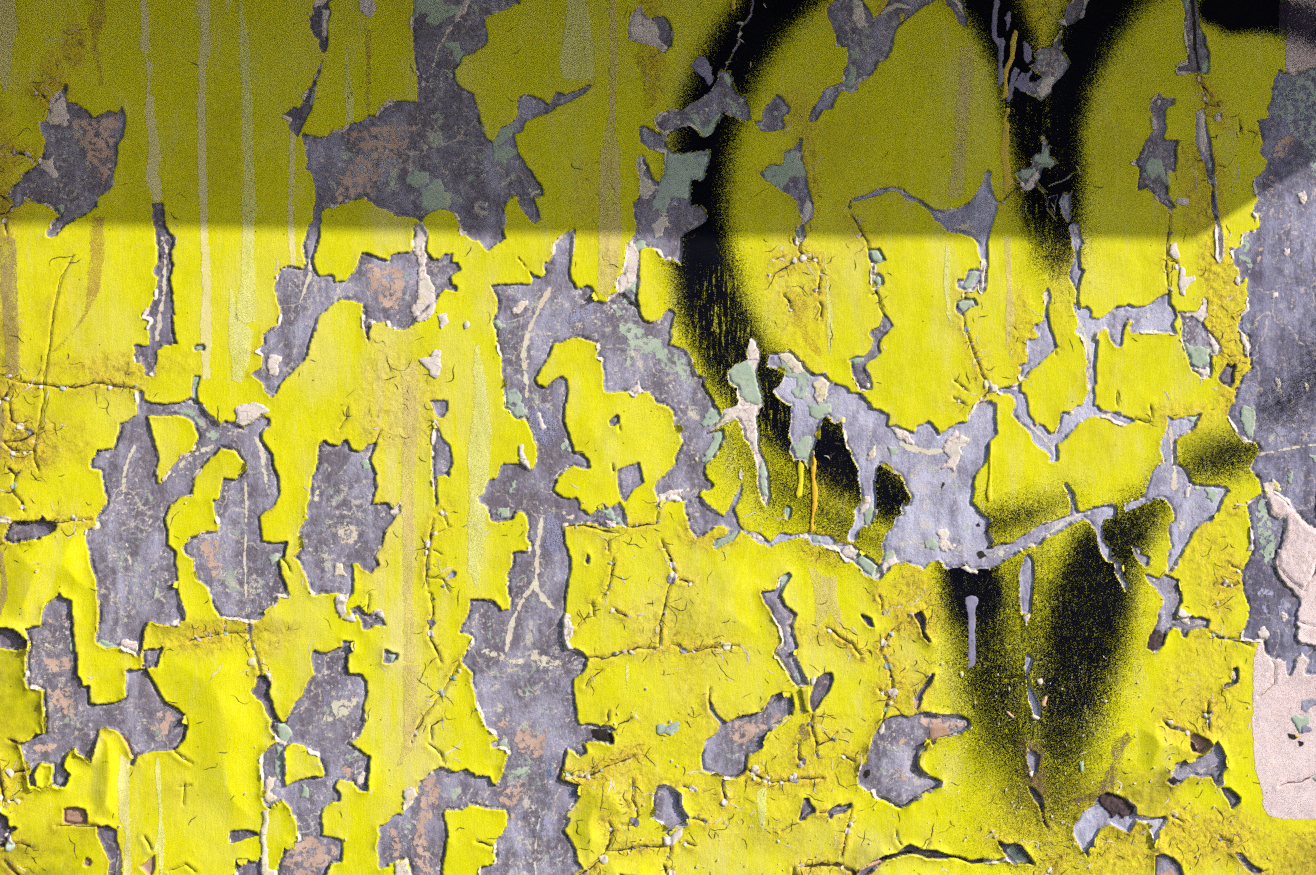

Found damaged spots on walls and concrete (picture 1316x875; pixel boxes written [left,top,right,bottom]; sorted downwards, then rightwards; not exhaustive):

peeling [627,5,675,53]
peeling [808,0,968,122]
peeling [1027,0,1089,100]
peeling [1175,0,1210,76]
peeling [0,0,593,875]
crack [333,337,455,462]
crack [743,443,845,530]
peeling [377,67,1316,875]
crack [1116,295,1245,426]
crack [561,500,1313,875]